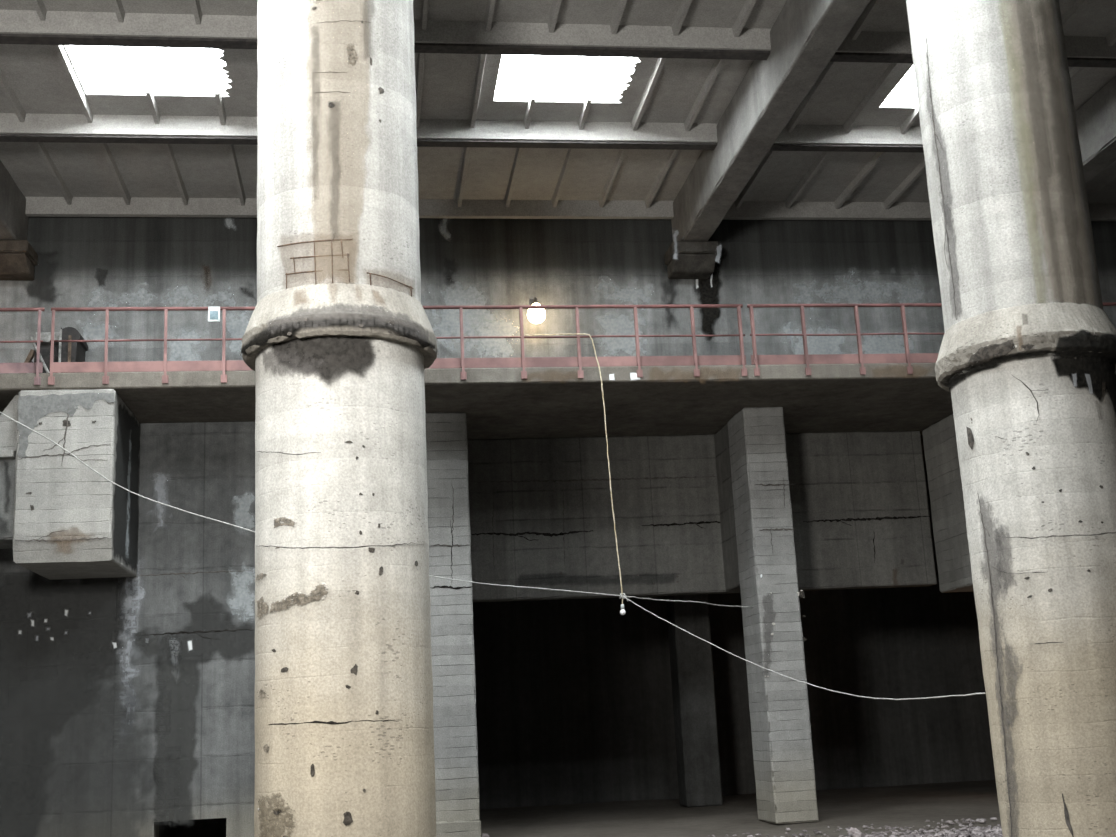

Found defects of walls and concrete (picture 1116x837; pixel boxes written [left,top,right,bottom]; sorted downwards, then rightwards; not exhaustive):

water stain [664,231,678,326]
water stain [694,245,724,340]
spalling [1052,330,1116,412]
water stain [0,404,255,837]
spalling [257,582,328,618]